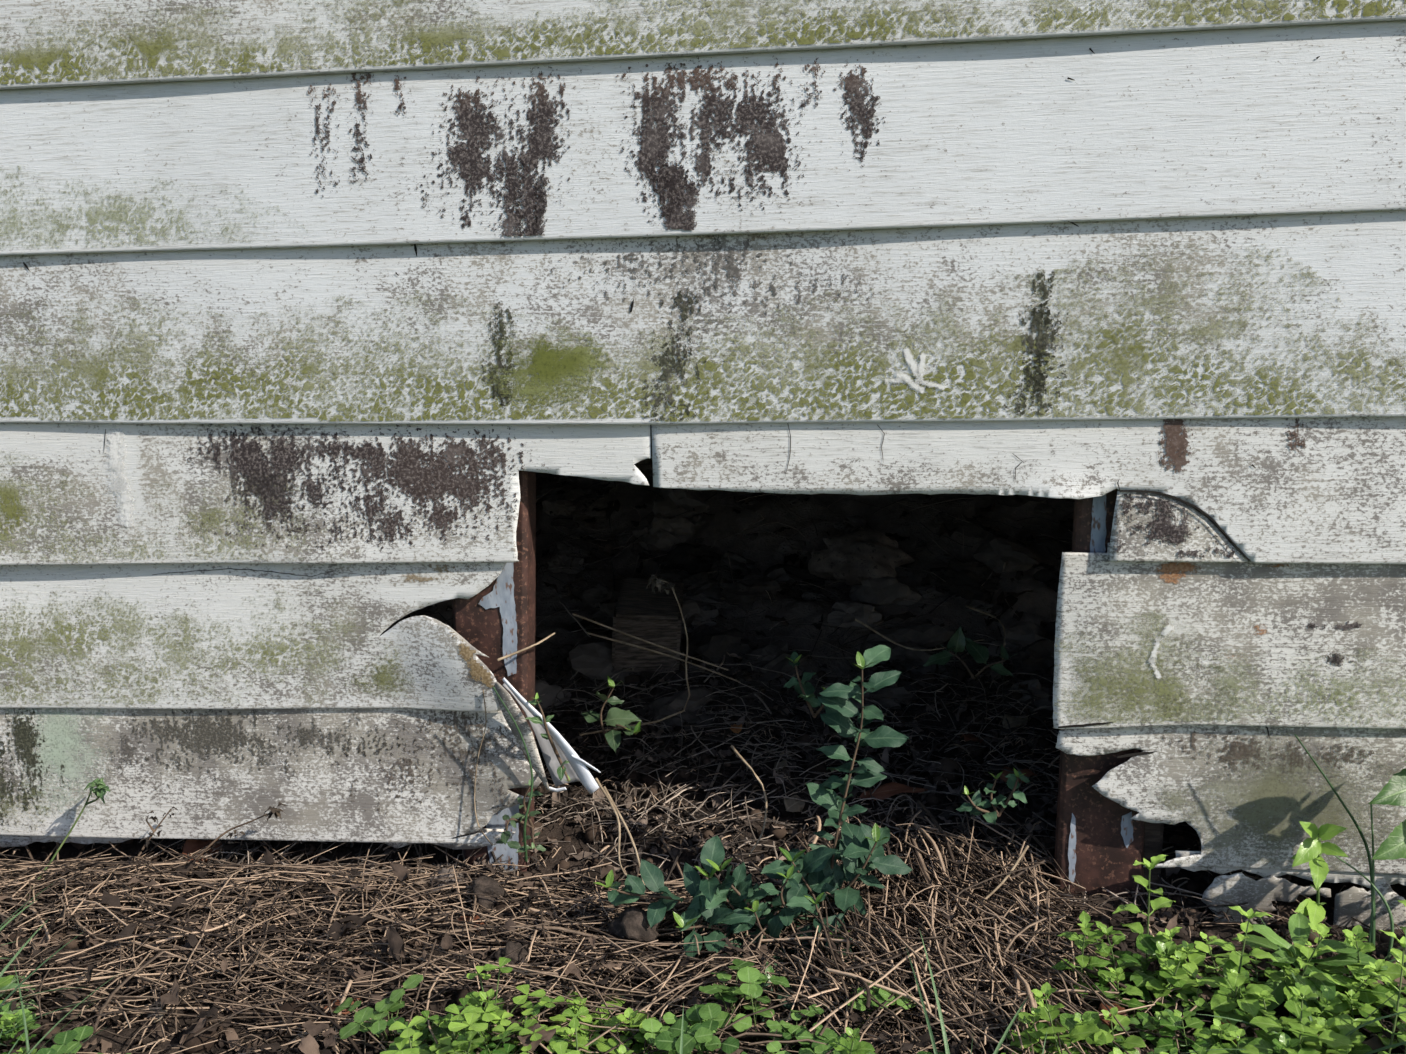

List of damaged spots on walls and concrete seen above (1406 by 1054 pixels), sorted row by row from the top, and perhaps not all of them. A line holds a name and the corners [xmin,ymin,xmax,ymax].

leakage [308,71,406,198]
leakage [416,66,572,237]
leakage [614,57,886,239]
leakage [1003,264,1068,415]
leakage [185,424,545,550]
peeling [1090,494,1106,553]
crack [1117,480,1251,561]
peeling [478,563,601,794]
leakage [0,708,79,829]
peeling [486,804,520,872]
peeling [1068,813,1076,883]
peeling [1121,812,1134,848]